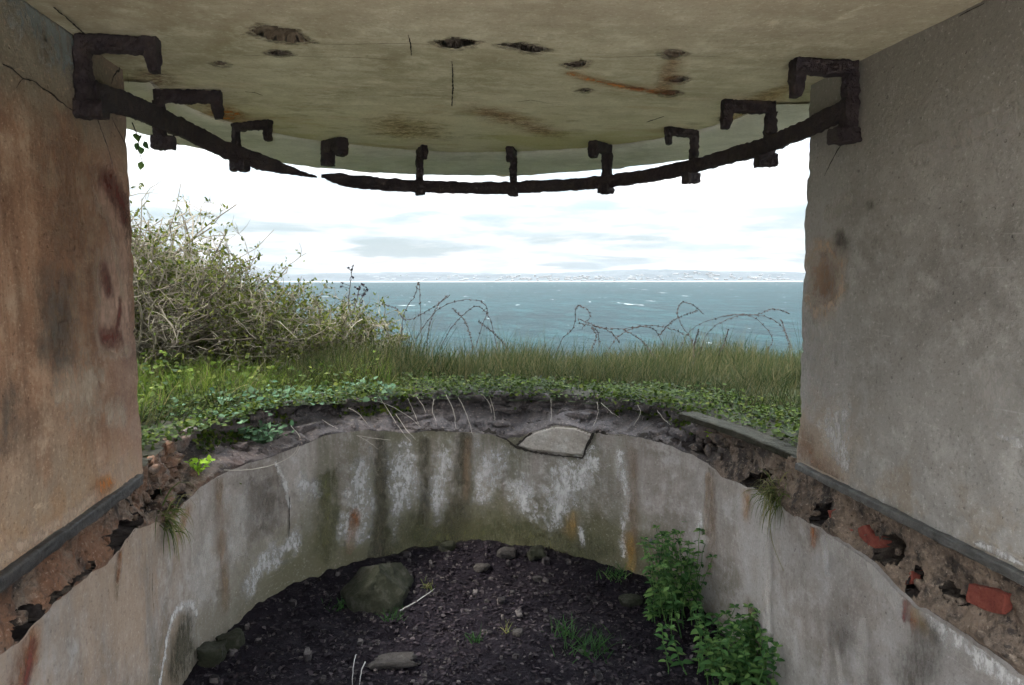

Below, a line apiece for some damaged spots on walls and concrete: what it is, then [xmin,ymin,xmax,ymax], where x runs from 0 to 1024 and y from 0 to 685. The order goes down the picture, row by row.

spalling [247,24,317,57]
spalling [432,37,481,51]
spalling [498,42,549,55]
crack [3,64,72,110]
crack [448,64,456,106]
crack [394,427,663,459]
spalling [102,488,164,556]
water stain [339,433,599,558]
water stain [616,449,636,563]
spalling [809,502,832,525]
spalling [873,533,907,566]
spalling [10,560,95,642]